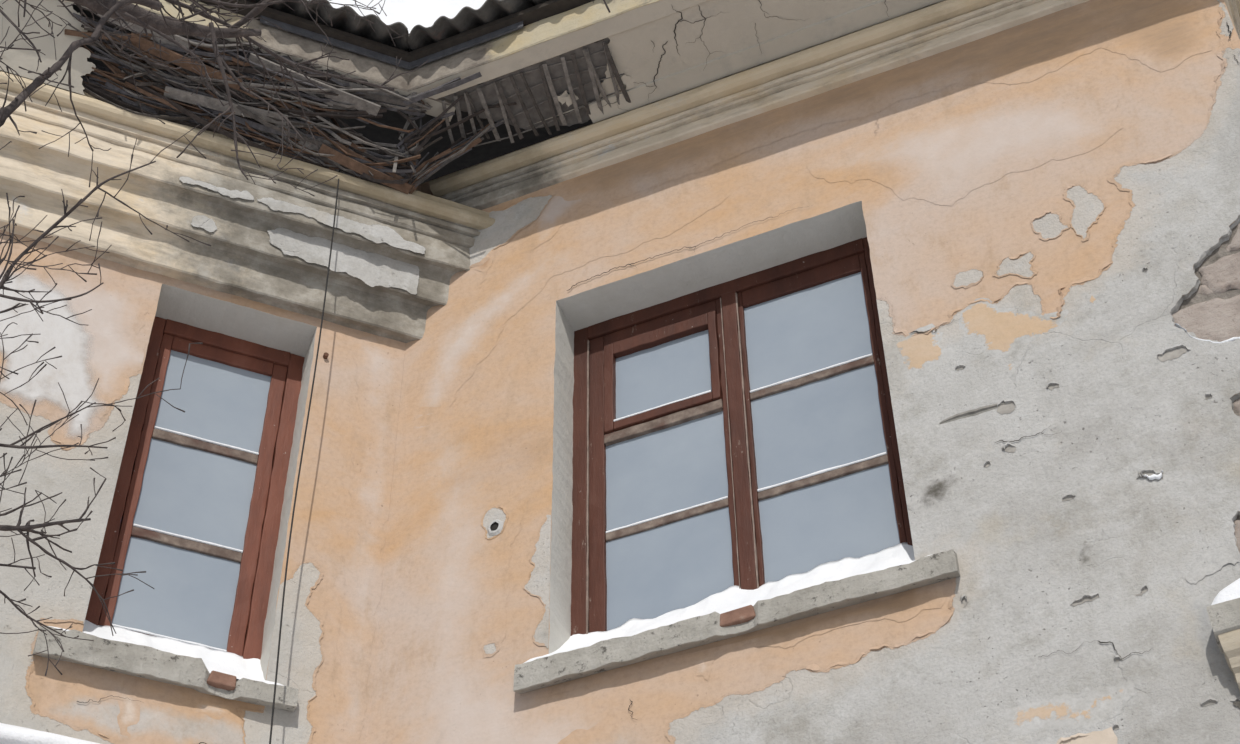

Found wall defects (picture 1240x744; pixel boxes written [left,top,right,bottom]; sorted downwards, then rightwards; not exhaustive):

crack [599,5,727,108]
peeling [179,176,425,294]
peeling [469,193,555,268]
peeling [557,0,1240,744]
peeling [0,275,324,744]
peeling [523,515,551,648]